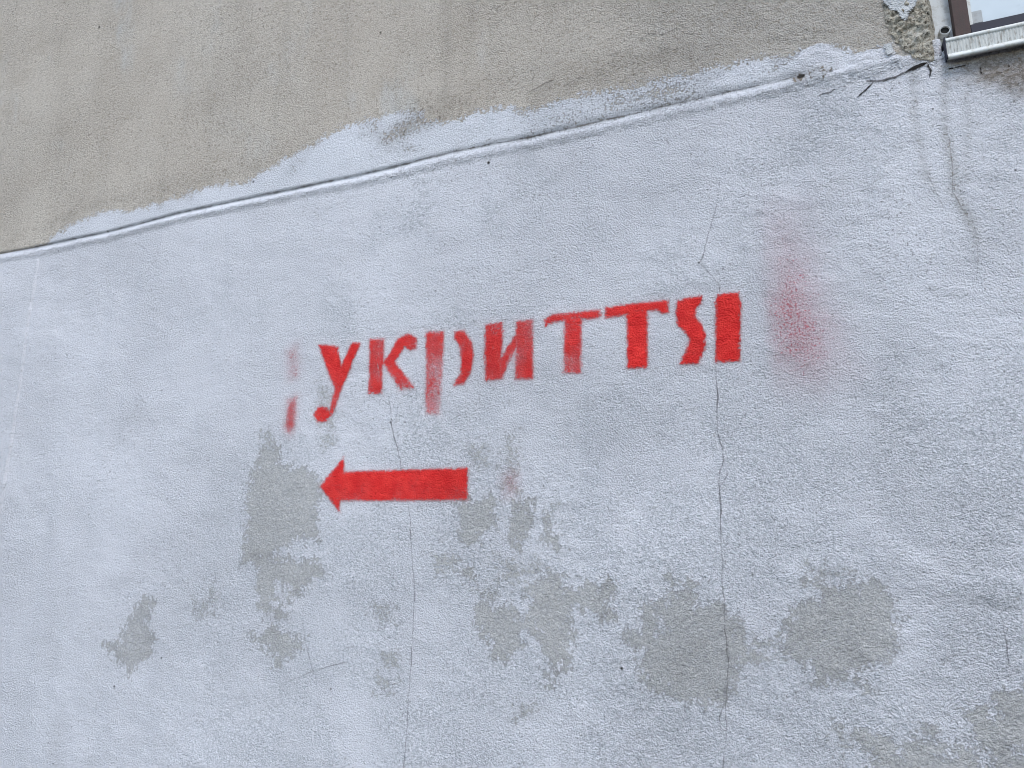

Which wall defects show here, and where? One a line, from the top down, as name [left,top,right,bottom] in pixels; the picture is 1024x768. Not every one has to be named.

crack [819,60,1010,97]